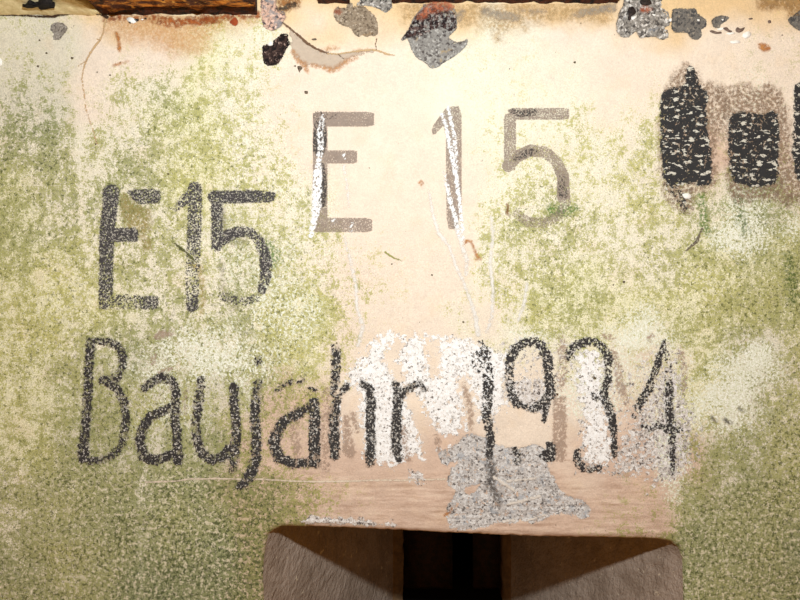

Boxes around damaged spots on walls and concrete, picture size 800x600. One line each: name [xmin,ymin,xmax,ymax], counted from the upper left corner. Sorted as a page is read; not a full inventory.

peeling [260,0,374,72]
spalling [334,0,392,37]
spalling [401,2,468,69]
spalling [616,0,753,44]
damp [429,193,495,337]
peeling [337,321,704,531]
peeling [301,515,398,530]